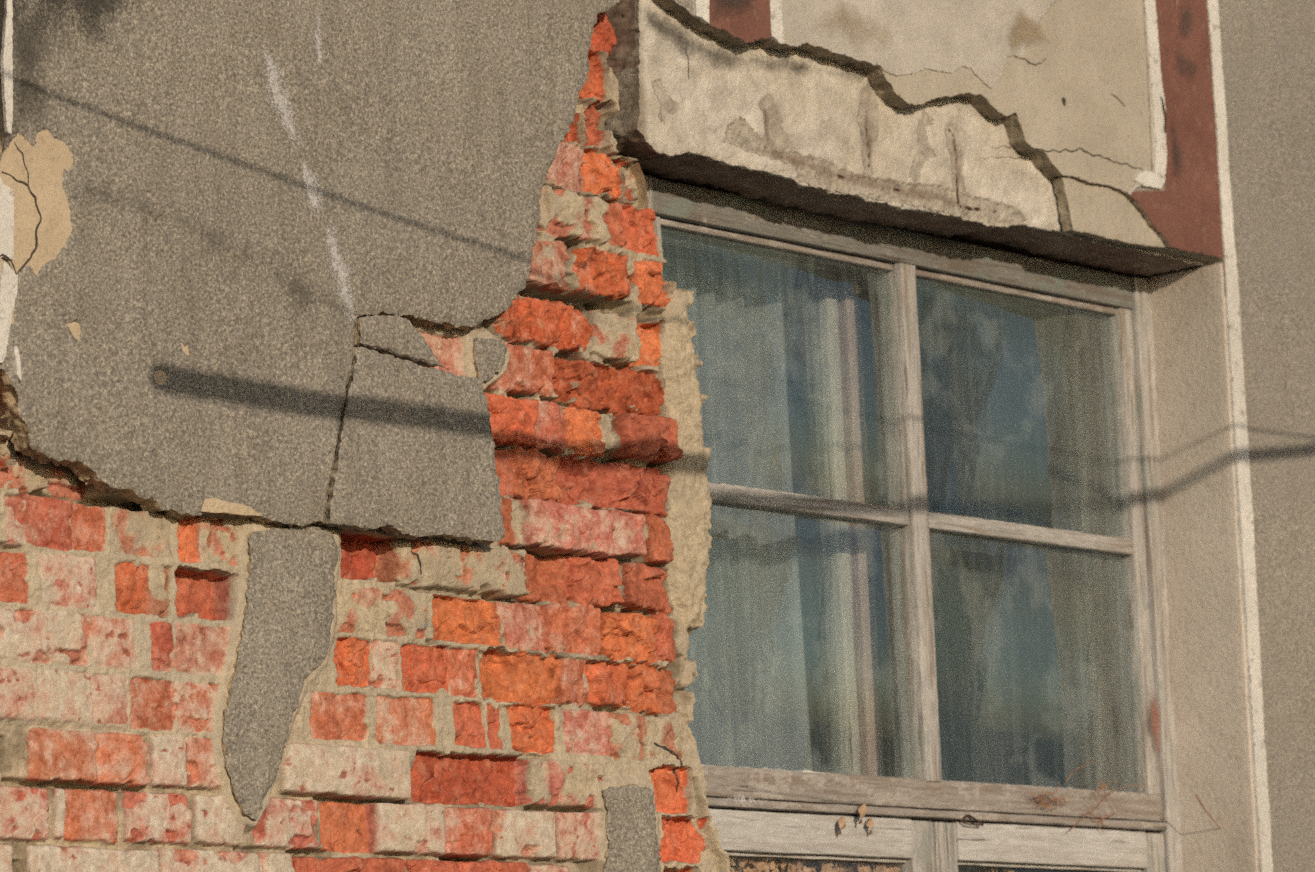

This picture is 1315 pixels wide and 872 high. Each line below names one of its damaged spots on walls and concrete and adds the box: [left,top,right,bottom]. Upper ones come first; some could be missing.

damp [5,0,117,111]
crack [0,142,42,274]
flaking render [0,129,73,275]
peeling [723,0,1151,228]
crack [992,145,1143,170]
crack [1160,96,1168,133]
spalling [479,4,683,716]
spalling [0,394,10,441]
crack [325,313,449,521]
flaking render [199,497,261,516]
spalling [292,855,529,872]
spalling [649,764,713,872]